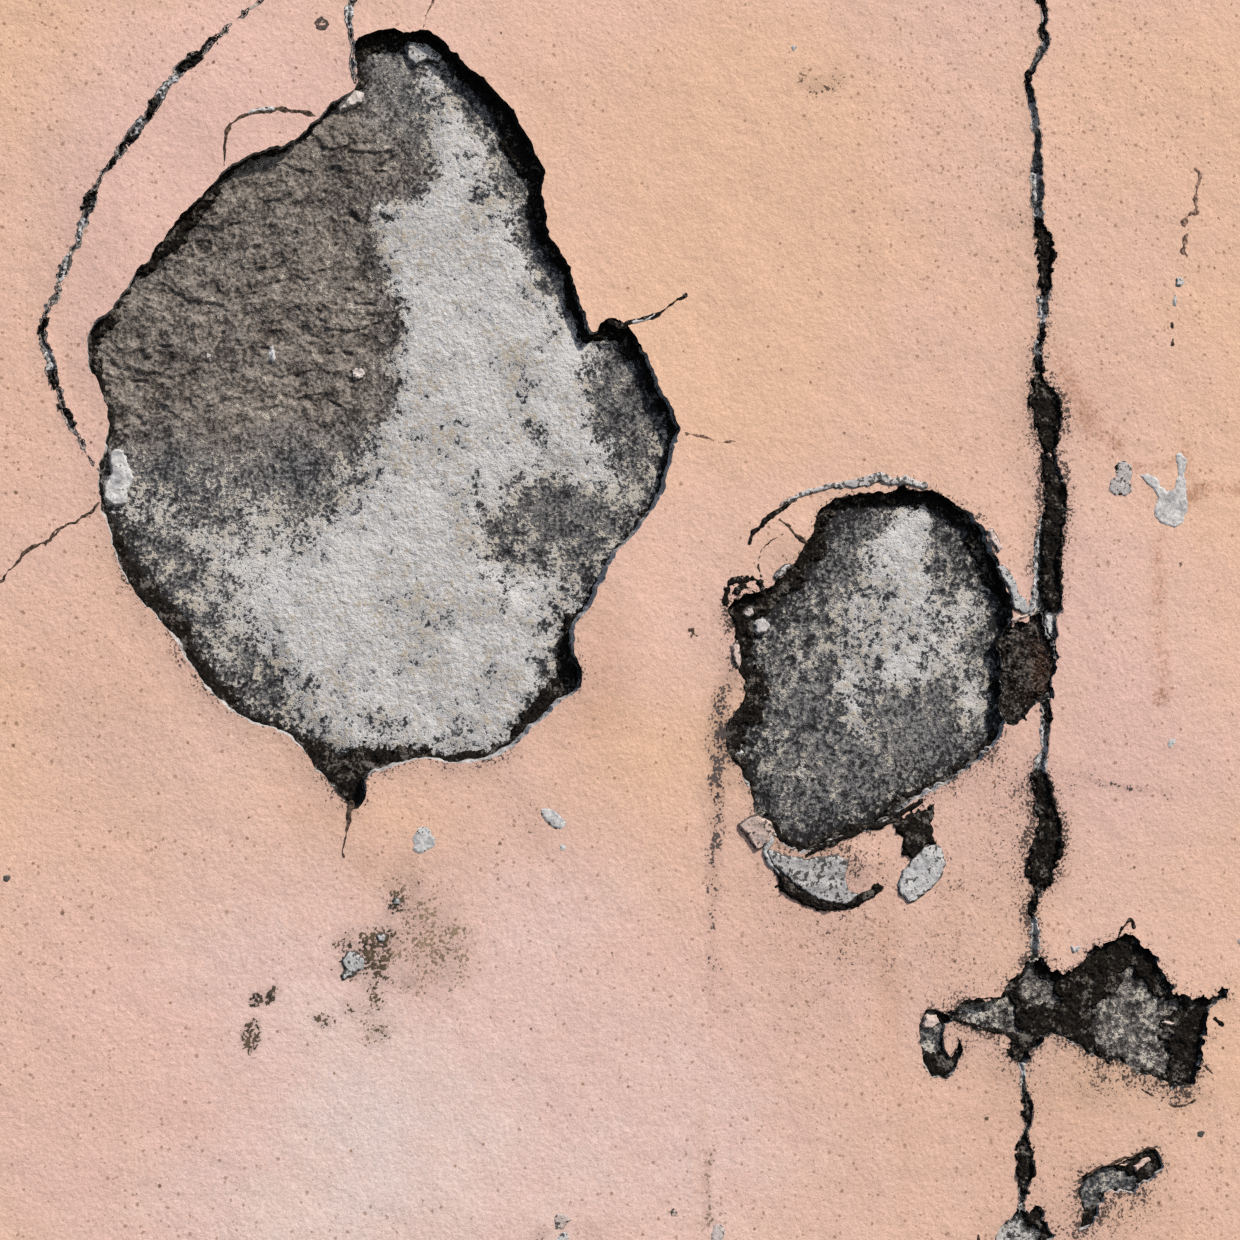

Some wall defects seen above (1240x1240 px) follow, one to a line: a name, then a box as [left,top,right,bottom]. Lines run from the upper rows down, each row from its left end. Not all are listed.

crack [223,106,315,166]
crack [37,0,264,472]
crack [608,293,688,329]
crack [0,502,100,583]
spalling [87,28,681,809]
crack [1024,0,1068,962]
peeling [1109,452,1188,527]
spalling [722,472,1029,912]
spalling [919,918,1228,1107]
spalling [995,1203,1055,1240]
crack [1014,1062,1037,1212]
spalling [1078,1145,1164,1231]